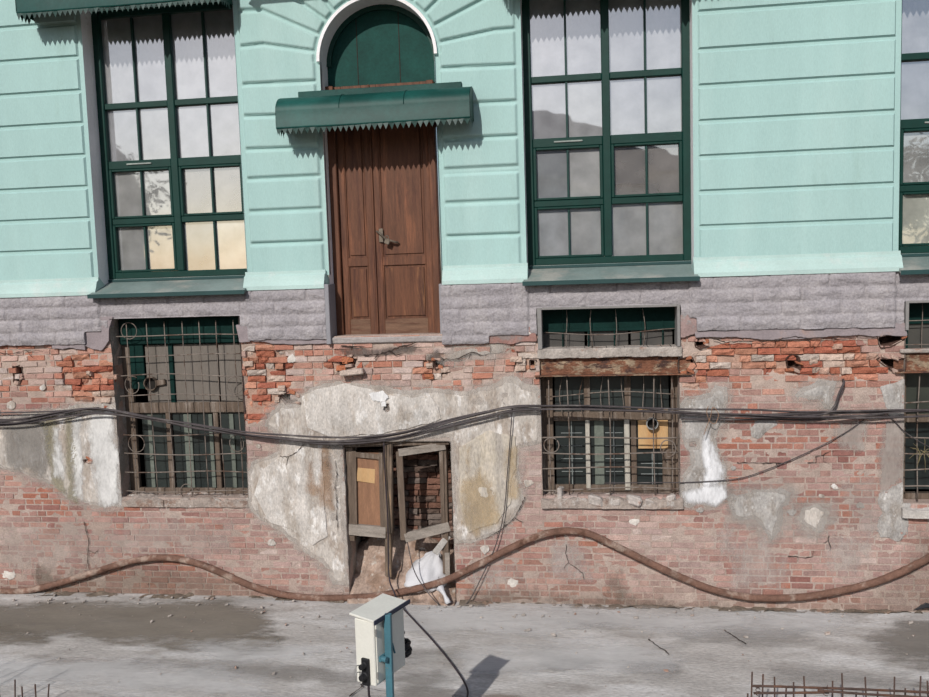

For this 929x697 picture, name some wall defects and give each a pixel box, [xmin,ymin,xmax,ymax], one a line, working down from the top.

peeling [0,354,123,509]
peeling [242,344,542,586]
spalling [588,493,654,507]
leakage [683,434,727,506]
spalling [666,335,911,542]